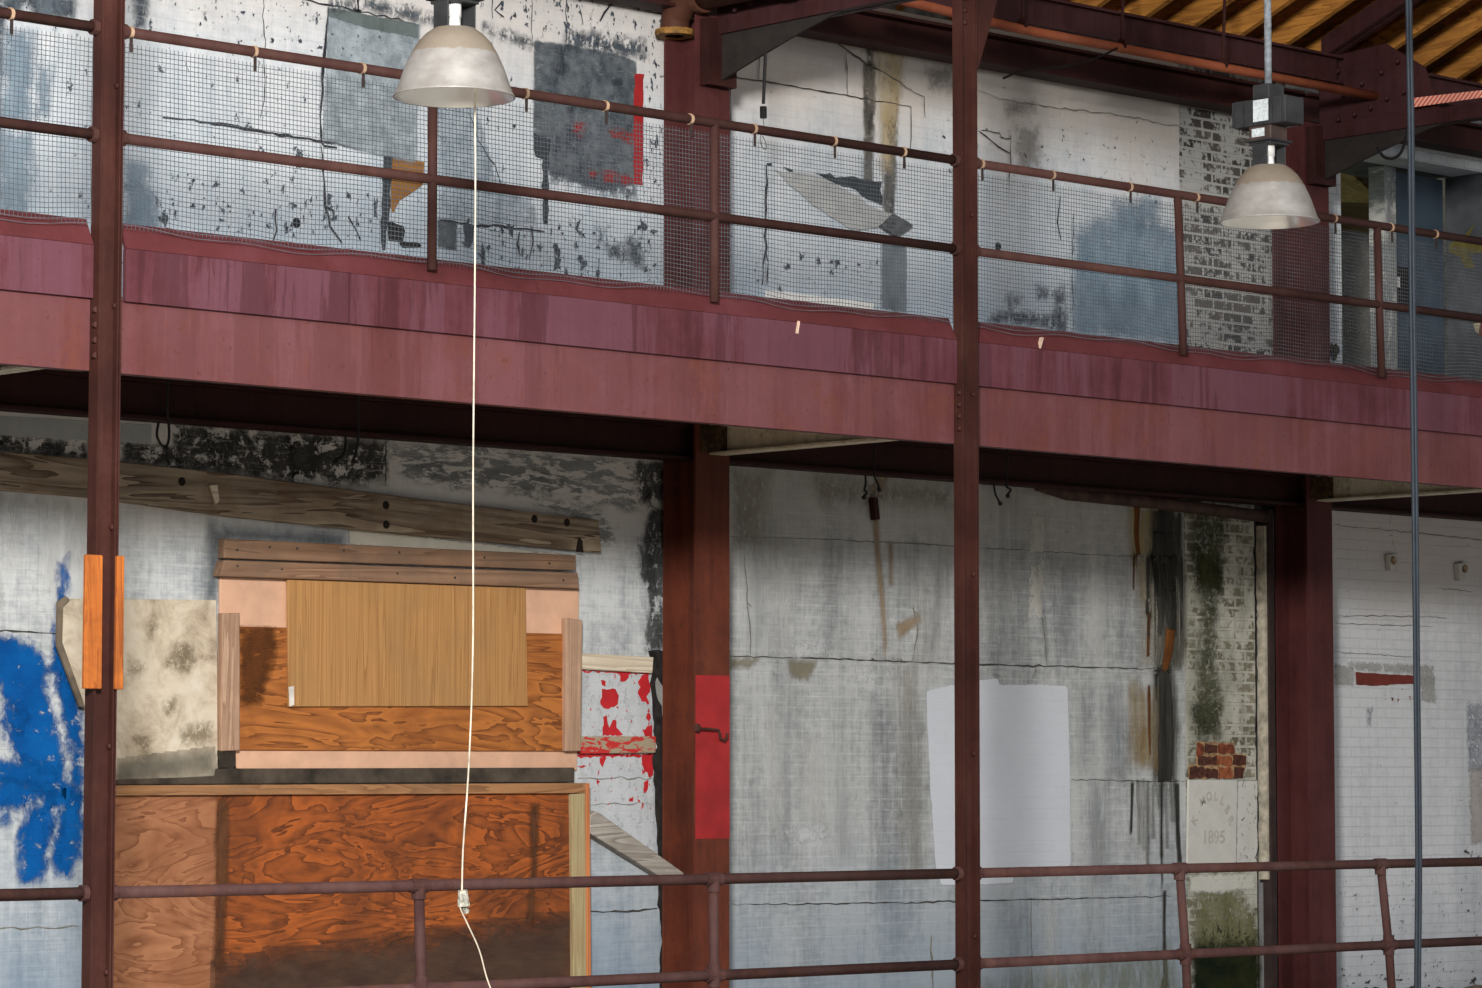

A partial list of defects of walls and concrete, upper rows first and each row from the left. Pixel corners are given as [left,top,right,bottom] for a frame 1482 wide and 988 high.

peeling [0,435,87,458]
rust [1133,507,1161,590]
peeling [122,424,663,857]
water stain [1130,509,1186,988]
spalling [1188,741,1256,894]